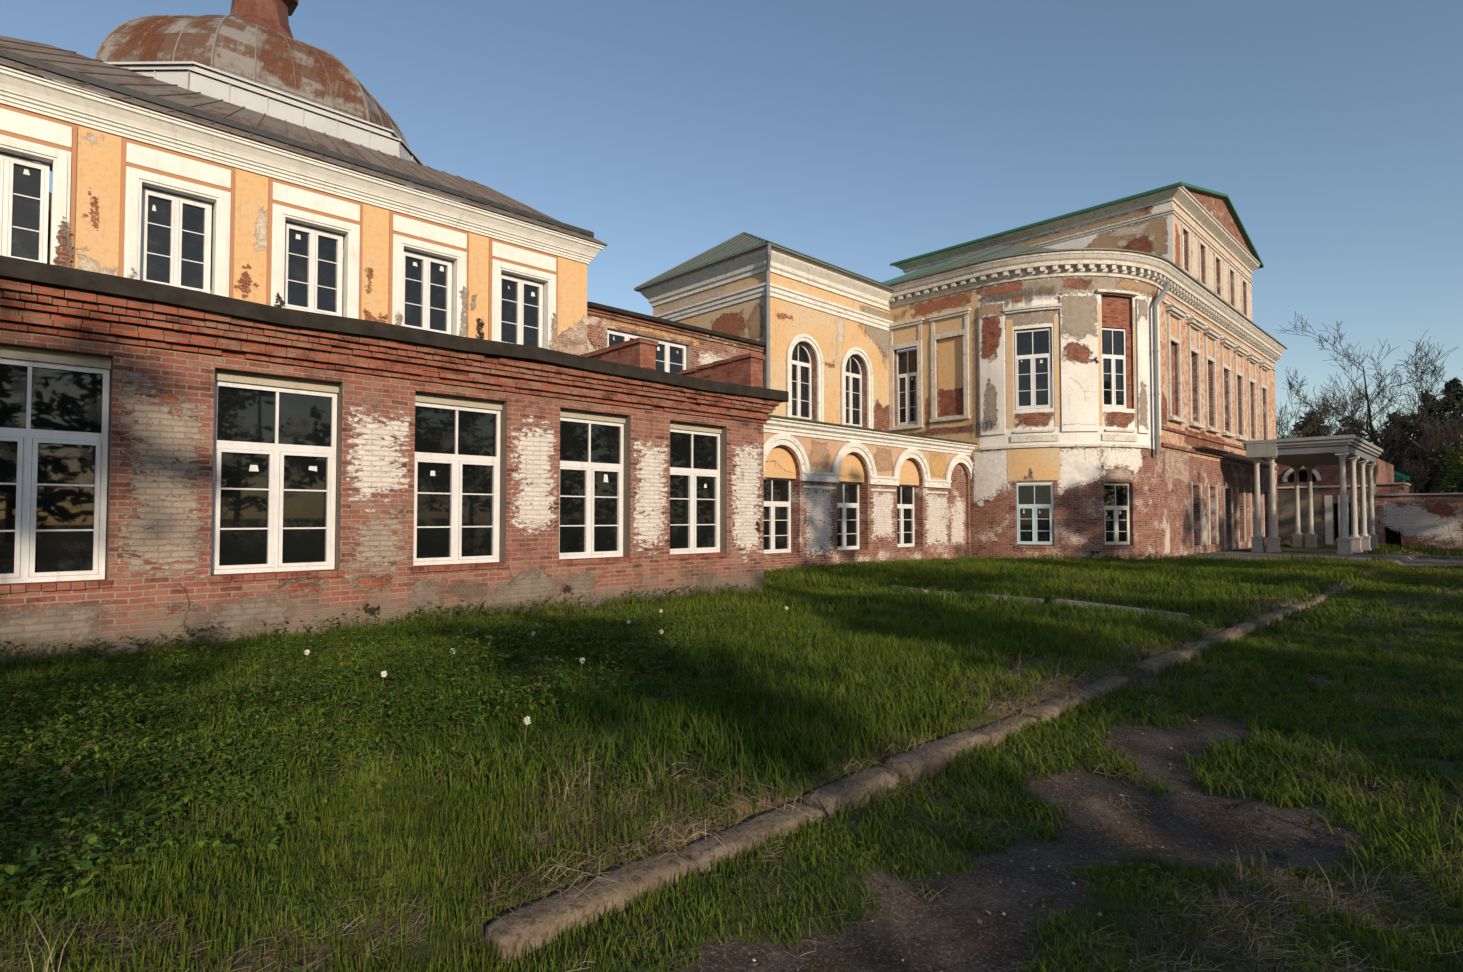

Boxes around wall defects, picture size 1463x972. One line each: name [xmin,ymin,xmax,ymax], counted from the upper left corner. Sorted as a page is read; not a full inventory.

rust [108,15,225,60]
rust [261,29,359,102]
spalling [53,188,137,278]
flaking render [908,276,1156,456]
peeling [116,372,208,582]
peeling [345,406,411,616]
peeling [510,415,557,535]
peeling [633,440,668,555]
peeling [730,441,766,563]
flaking render [873,399,894,472]
peeling [871,491,896,541]
peeling [924,468,1033,549]